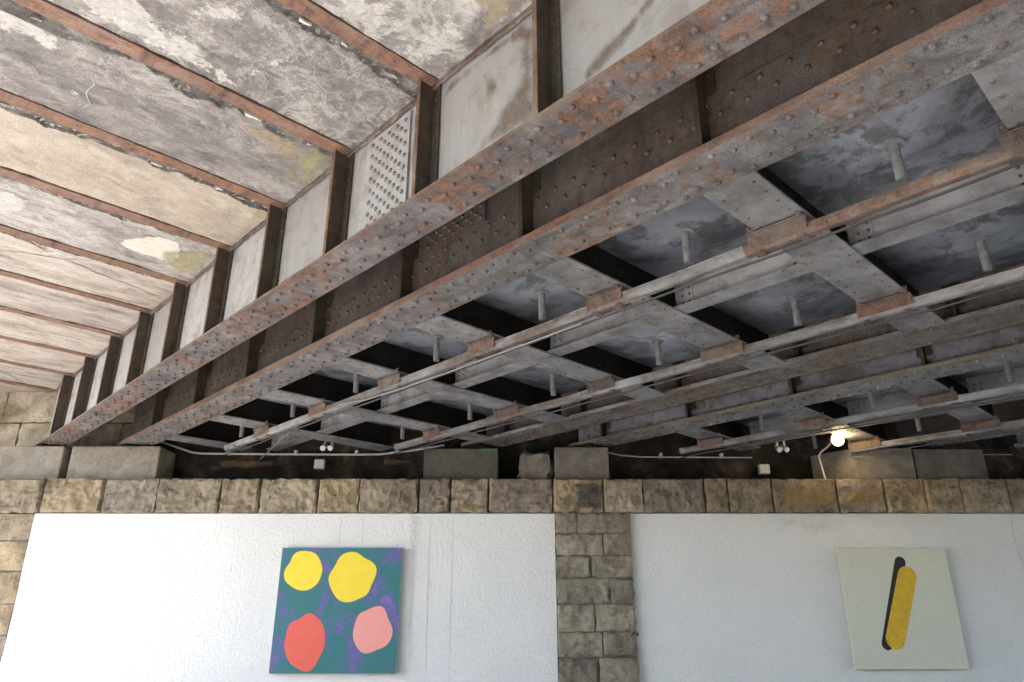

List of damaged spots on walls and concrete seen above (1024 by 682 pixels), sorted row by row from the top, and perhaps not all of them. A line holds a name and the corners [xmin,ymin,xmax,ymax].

spalling [0,231,173,283]
peeling [0,175,183,262]